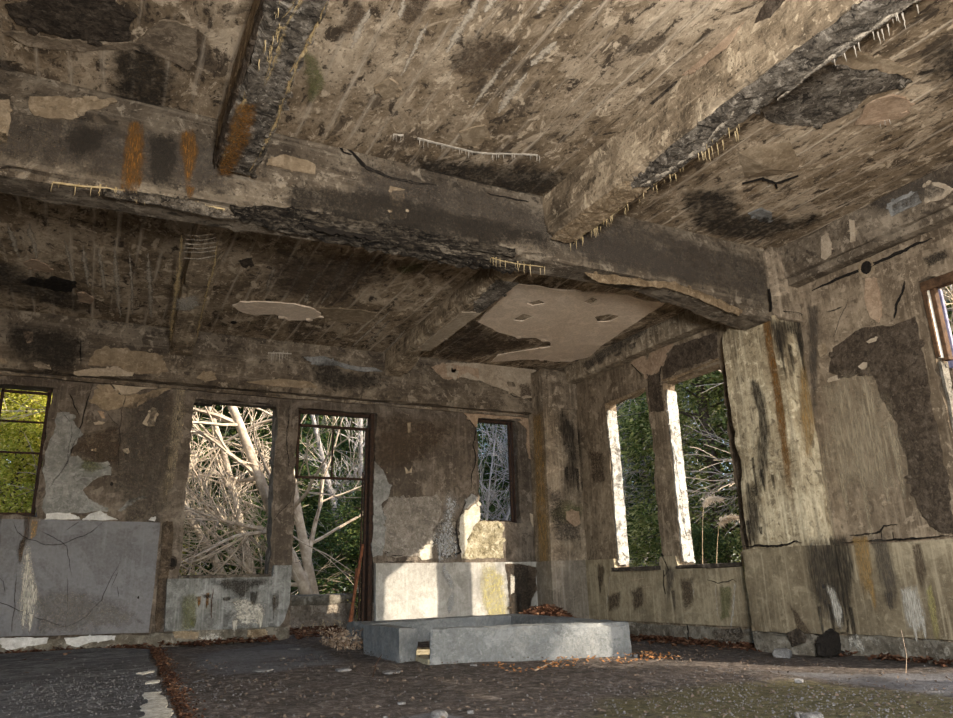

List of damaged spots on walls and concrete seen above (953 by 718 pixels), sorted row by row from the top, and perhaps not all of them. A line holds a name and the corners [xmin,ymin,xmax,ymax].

crack [339,147,437,186]
spalling [551,0,921,243]
crack [742,175,799,189]
spalling [24,276,94,304]
crack [812,238,932,291]
leakage [771,306,818,411]
peeling [42,412,145,521]
spalling [371,461,538,614]
leakage [746,380,775,544]
crack [746,539,801,547]
leakage [808,378,938,652]
crack [847,524,953,543]